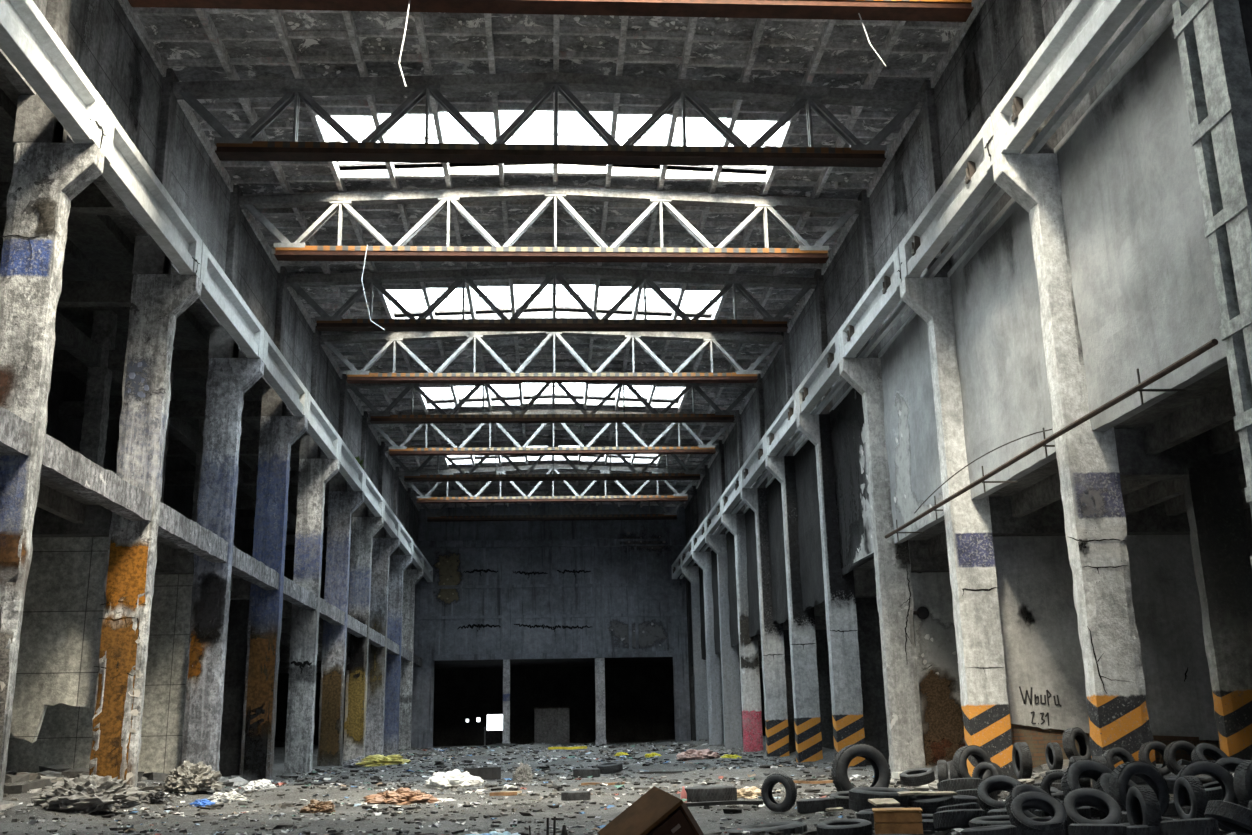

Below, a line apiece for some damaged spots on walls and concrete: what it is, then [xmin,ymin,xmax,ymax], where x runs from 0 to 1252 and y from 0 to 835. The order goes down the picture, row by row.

spalling [0,630,14,759]
spalling [128,670,142,733]
spalling [916,613,966,766]